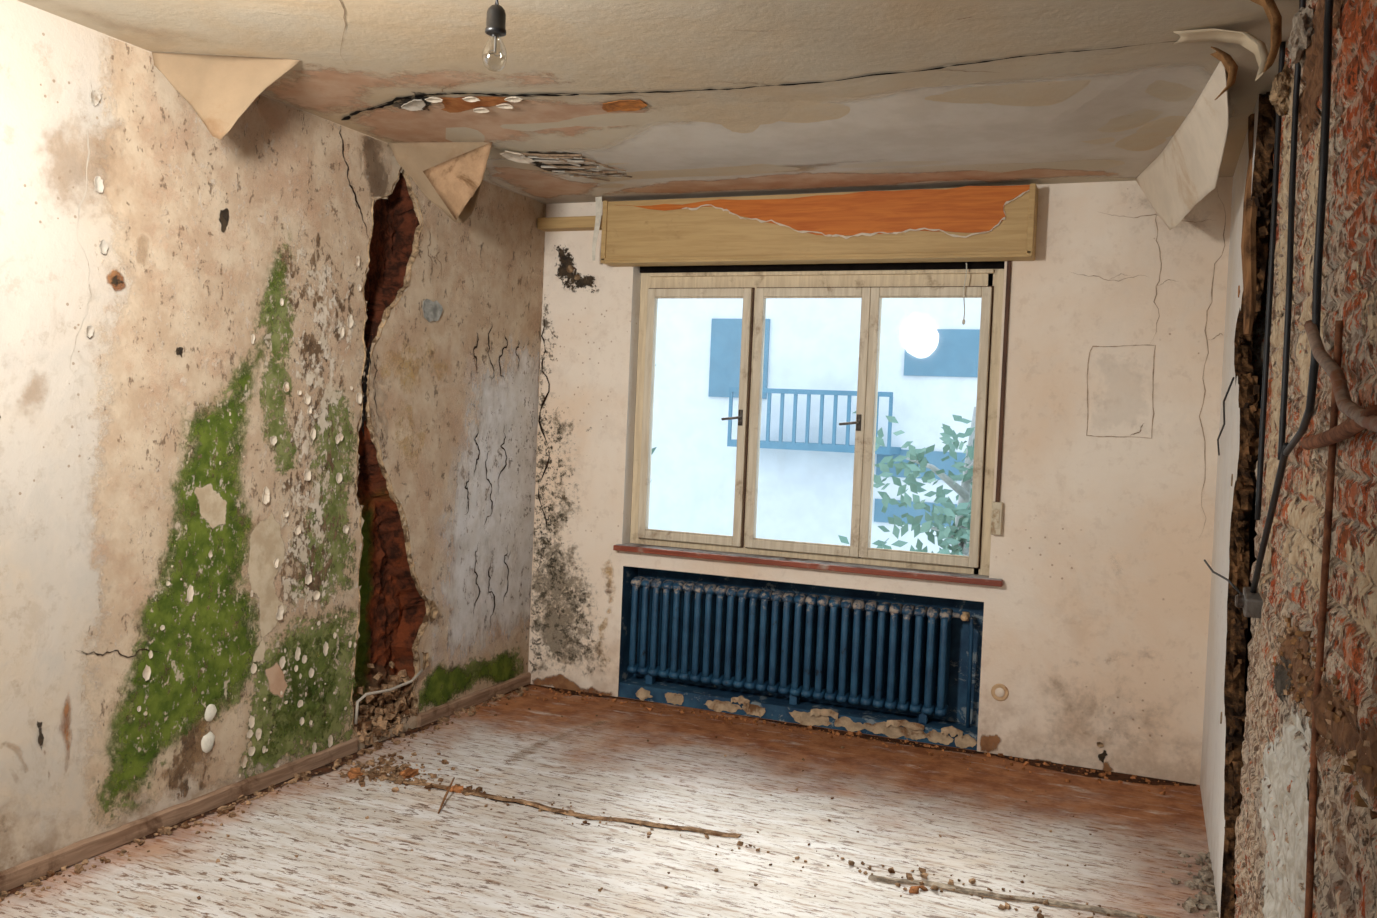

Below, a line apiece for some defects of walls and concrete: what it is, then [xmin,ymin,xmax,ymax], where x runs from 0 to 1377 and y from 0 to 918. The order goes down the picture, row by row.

water stain [98,244,358,817]
crack [473,324,520,382]
water stain [418,297,612,711]
peeling [69,0,1282,826]
spalling [1272,615,1377,820]